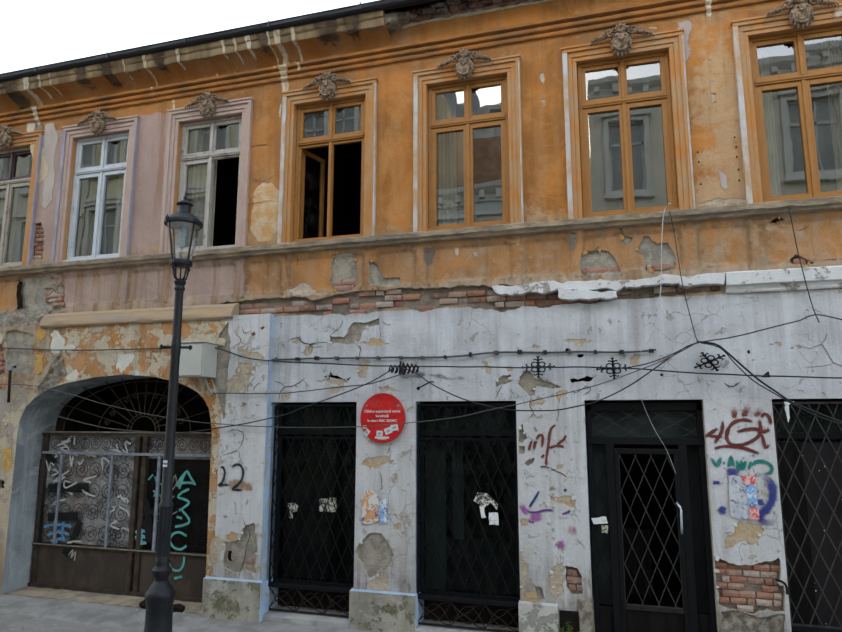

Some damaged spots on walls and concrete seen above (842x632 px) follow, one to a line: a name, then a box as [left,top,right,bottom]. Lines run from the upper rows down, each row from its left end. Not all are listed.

flaking render [619,227,676,274]
flaking render [221,249,721,346]
flaking render [0,274,84,394]
flaking render [181,323,265,418]
crack [287,324,342,348]
crack [805,334,842,367]
flaking render [482,361,596,486]
flaking render [208,523,258,574]
flaking render [355,532,405,591]
peeling [520,549,583,602]
spalling [559,610,580,632]
flaking render [714,556,785,632]